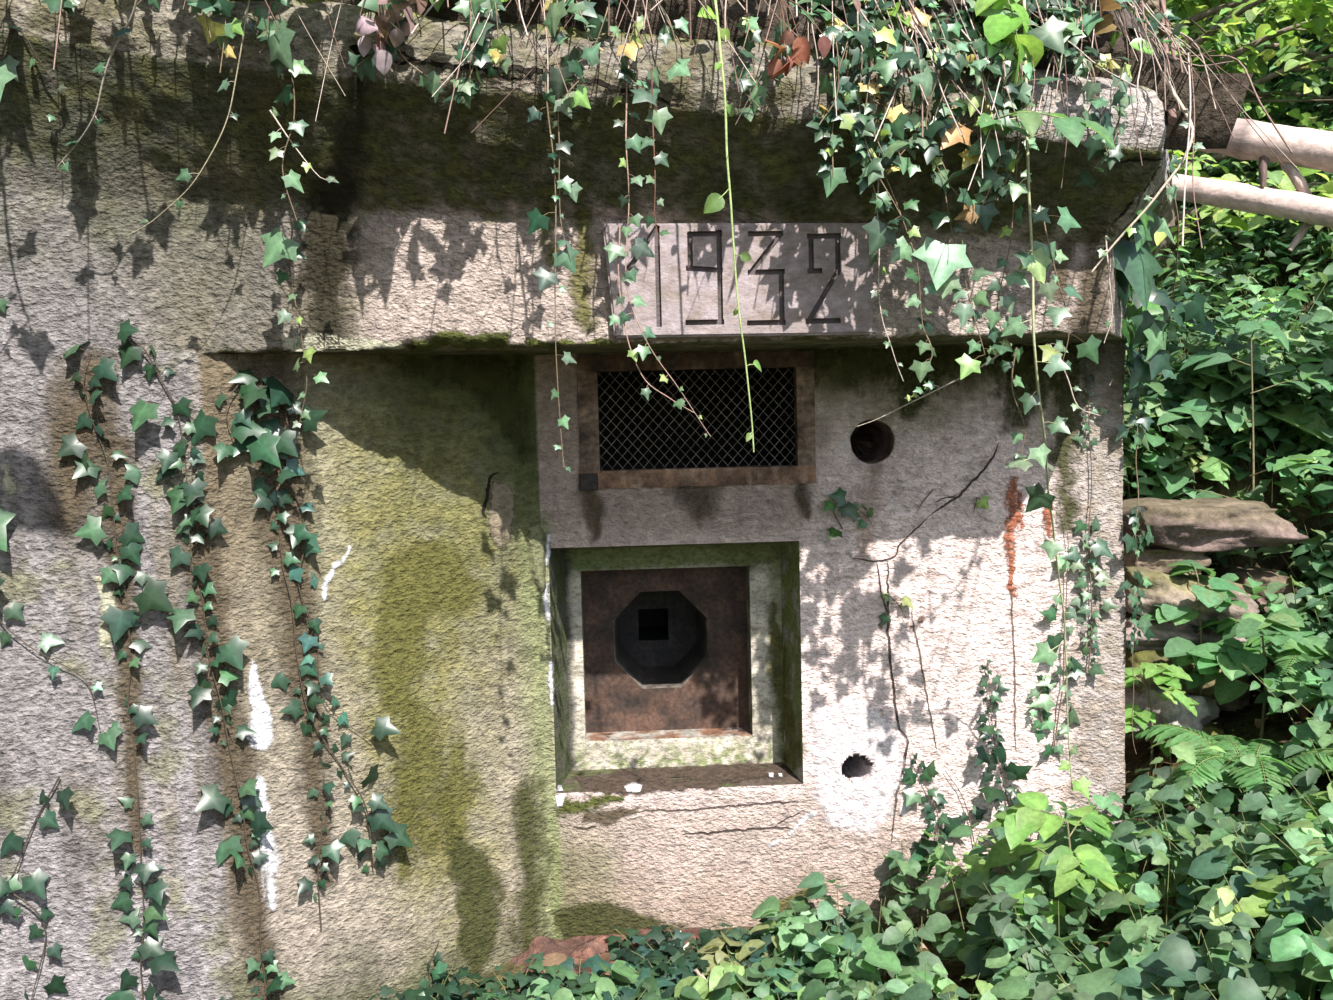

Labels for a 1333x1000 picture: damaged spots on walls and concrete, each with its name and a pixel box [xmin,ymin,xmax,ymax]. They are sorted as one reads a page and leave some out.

leakage [299,73,368,352]
leakage [244,355,332,887]
spalling [489,481,515,547]
crack [848,442,999,841]
rust [1003,477,1025,597]
rust [1043,506,1054,537]
leakage [383,705,476,879]